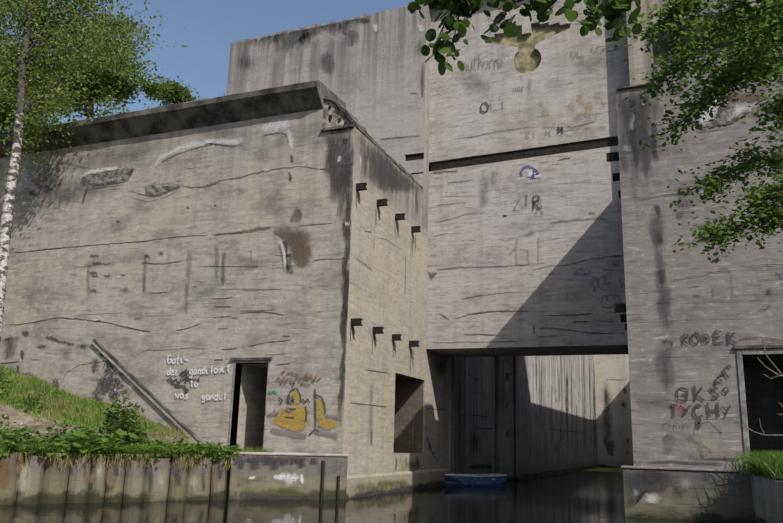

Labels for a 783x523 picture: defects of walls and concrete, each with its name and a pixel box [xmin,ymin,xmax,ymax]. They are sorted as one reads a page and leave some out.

leakage [619,94,658,170]
spalling [82,167,135,203]
crack [188,164,351,188]
crack [16,227,269,253]
leakage [275,231,309,267]
leakage [326,127,418,406]
leakage [653,205,662,243]
leakage [657,253,670,321]
crack [10,317,149,351]
crack [166,289,283,350]
crack [215,336,290,365]
leakage [541,370,615,456]